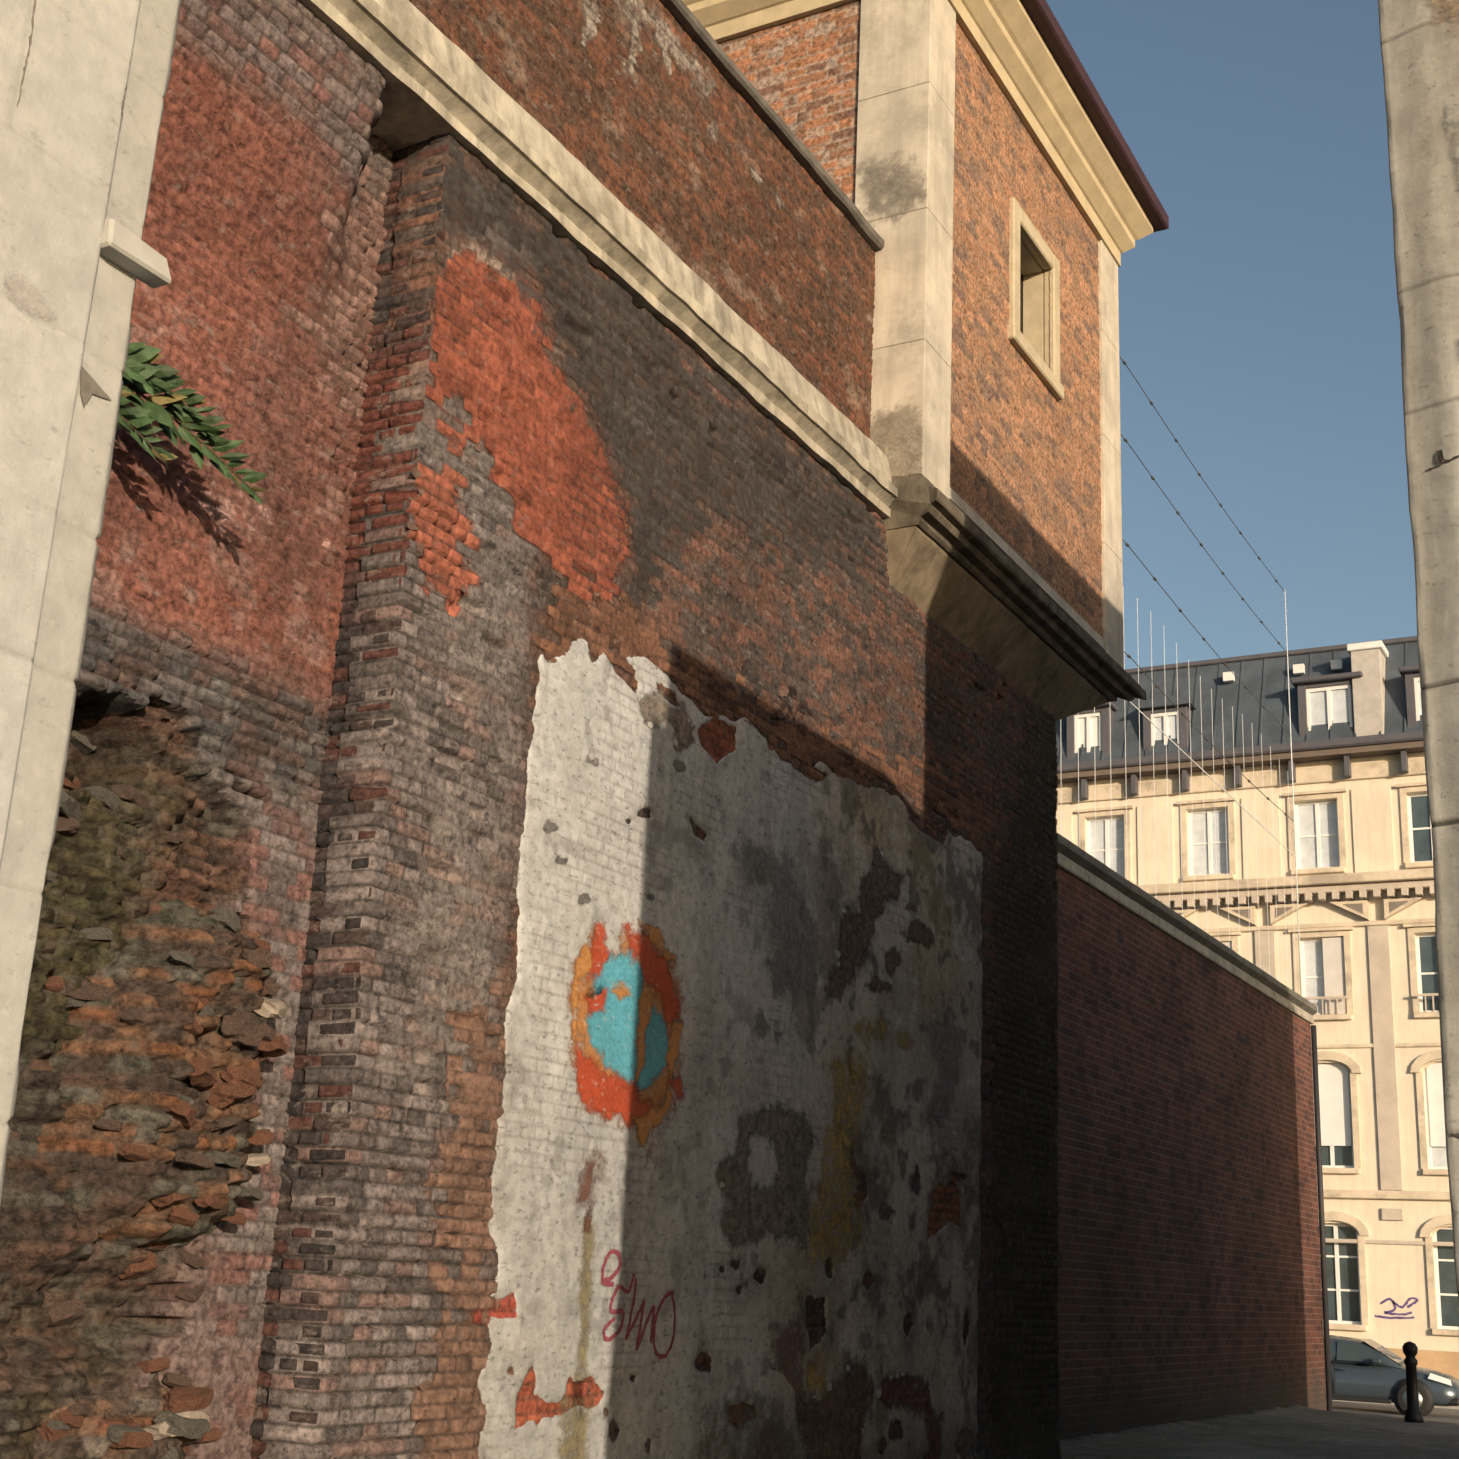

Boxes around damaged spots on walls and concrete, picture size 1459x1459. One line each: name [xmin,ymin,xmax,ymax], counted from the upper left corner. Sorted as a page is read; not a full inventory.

crack [17,0,36,108]
damp [855,153,927,221]
crack [1425,454,1459,472]
spalling [404,230,1003,864]
spalling [578,893,591,904]
spalling [0,684,268,1459]
spalling [912,1163,964,1239]
spalling [513,1366,604,1429]